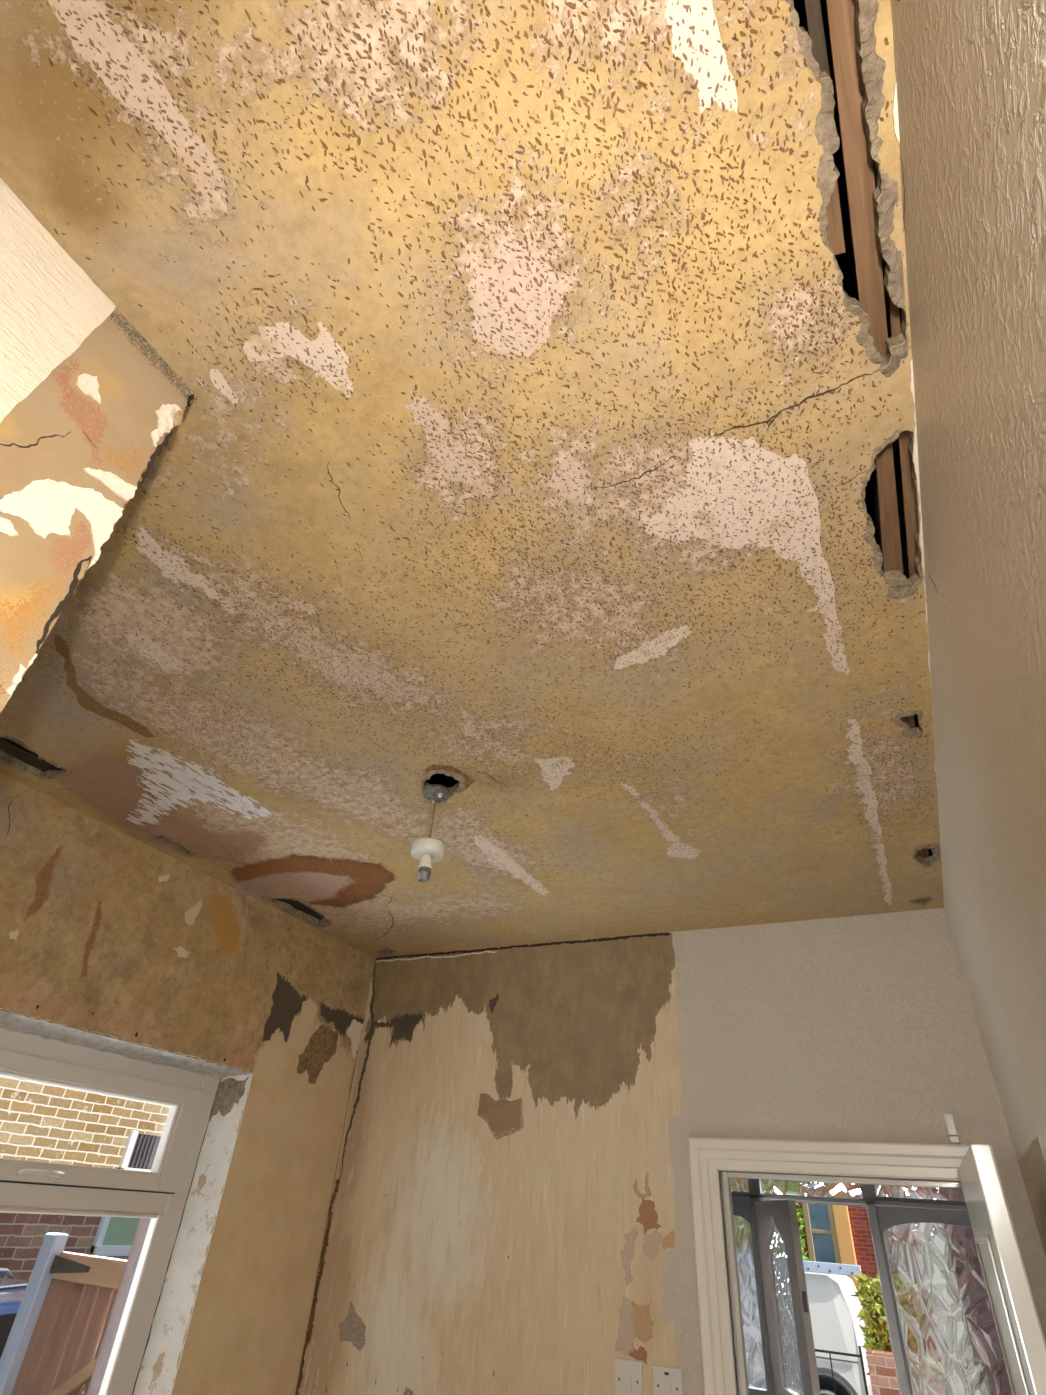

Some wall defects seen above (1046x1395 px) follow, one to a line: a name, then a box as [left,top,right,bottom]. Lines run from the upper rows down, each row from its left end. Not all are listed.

spalling [784,0,908,378]
peeling [49,356,110,466]
spalling [151,392,196,447]
crack [597,460,669,488]
crack [705,366,886,442]
spalling [860,429,922,600]
spalling [0,735,74,780]
peeling [125,739,274,826]
spalling [261,896,332,927]
peeling [263,933,676,1139]
crack [295,894,670,1395]
spalling [615,1172,676,1365]